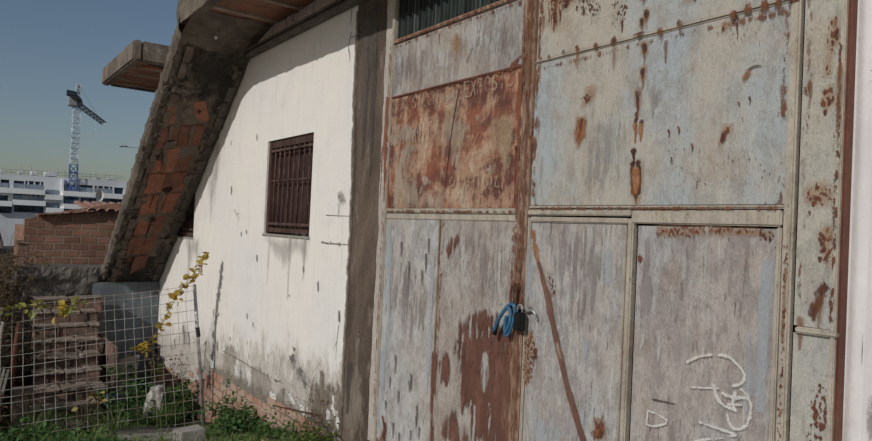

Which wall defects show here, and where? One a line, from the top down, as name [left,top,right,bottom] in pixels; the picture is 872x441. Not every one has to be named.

spalling [118,94,210,275]
corrosion [377,0,746,441]
corrosion [719,127,783,211]
corrosion [694,0,811,135]
corrosion [806,16,843,268]
flaking render [216,338,341,440]
corrosion [373,338,386,441]
corrosion [656,224,802,438]